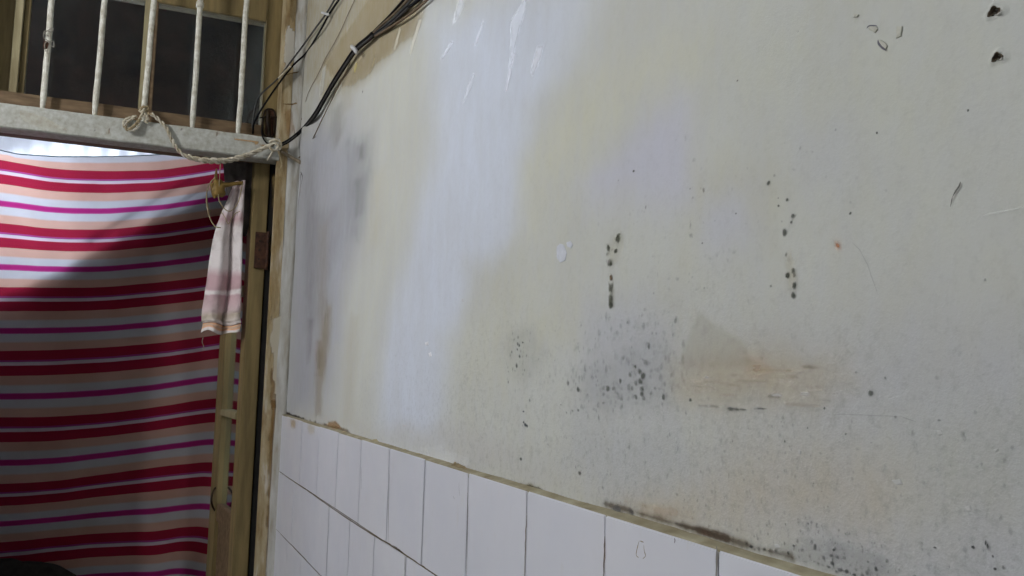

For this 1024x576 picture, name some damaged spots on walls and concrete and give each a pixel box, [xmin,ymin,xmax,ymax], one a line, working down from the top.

water stain [606,233,620,309]
water stain [602,343,665,404]
water stain [676,523,730,576]
water stain [749,532,888,576]